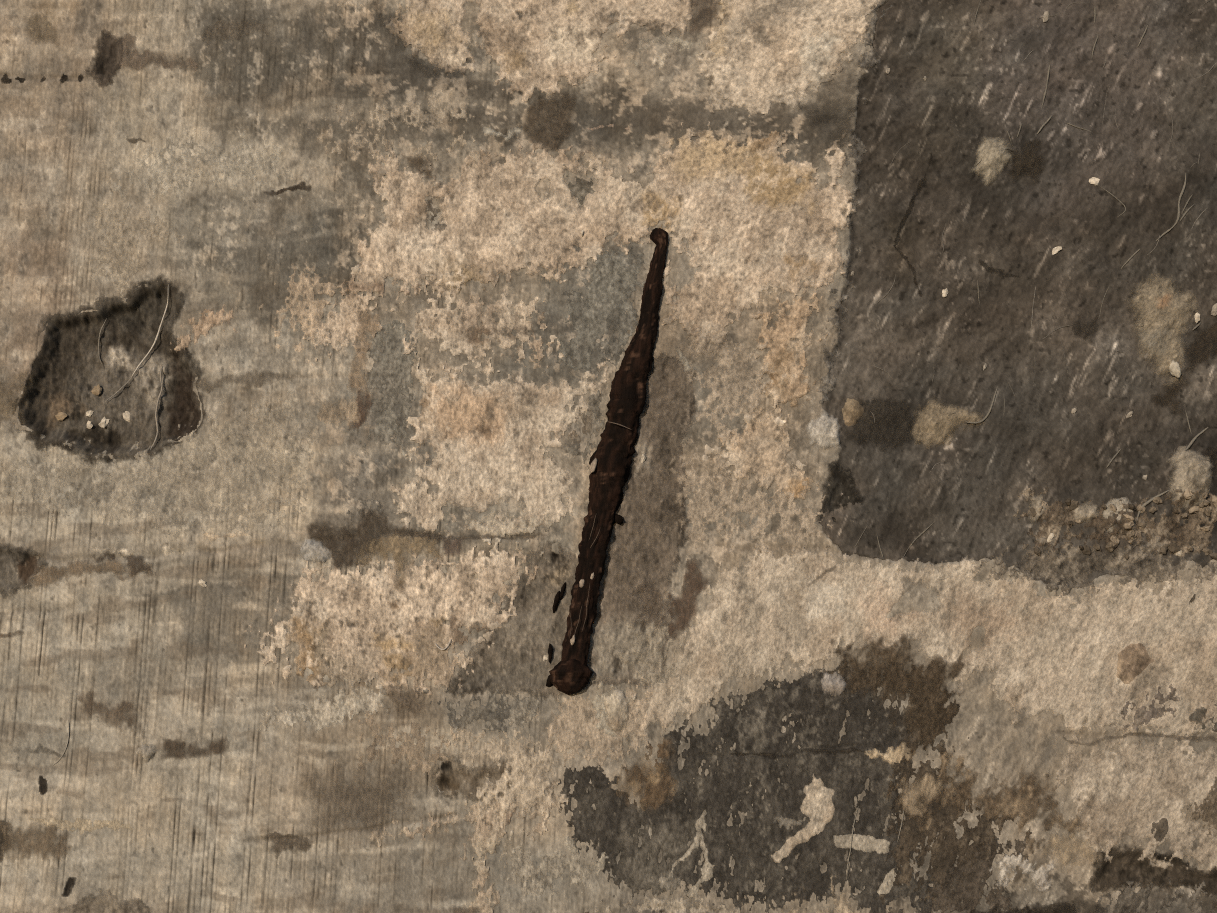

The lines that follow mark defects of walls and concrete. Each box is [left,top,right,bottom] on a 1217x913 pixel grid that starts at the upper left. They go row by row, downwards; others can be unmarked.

hole [13,276,205,464]
hole [819,462,863,522]
spalling [0,544,46,597]
corrosion [553,582,566,613]
spalling [972,480,1217,605]
peeling [1121,685,1217,739]
peeling [557,654,1033,913]
peeling [1187,777,1217,835]
hole [0,820,8,862]
spalling [1089,818,1217,913]
spalling [62,893,150,913]